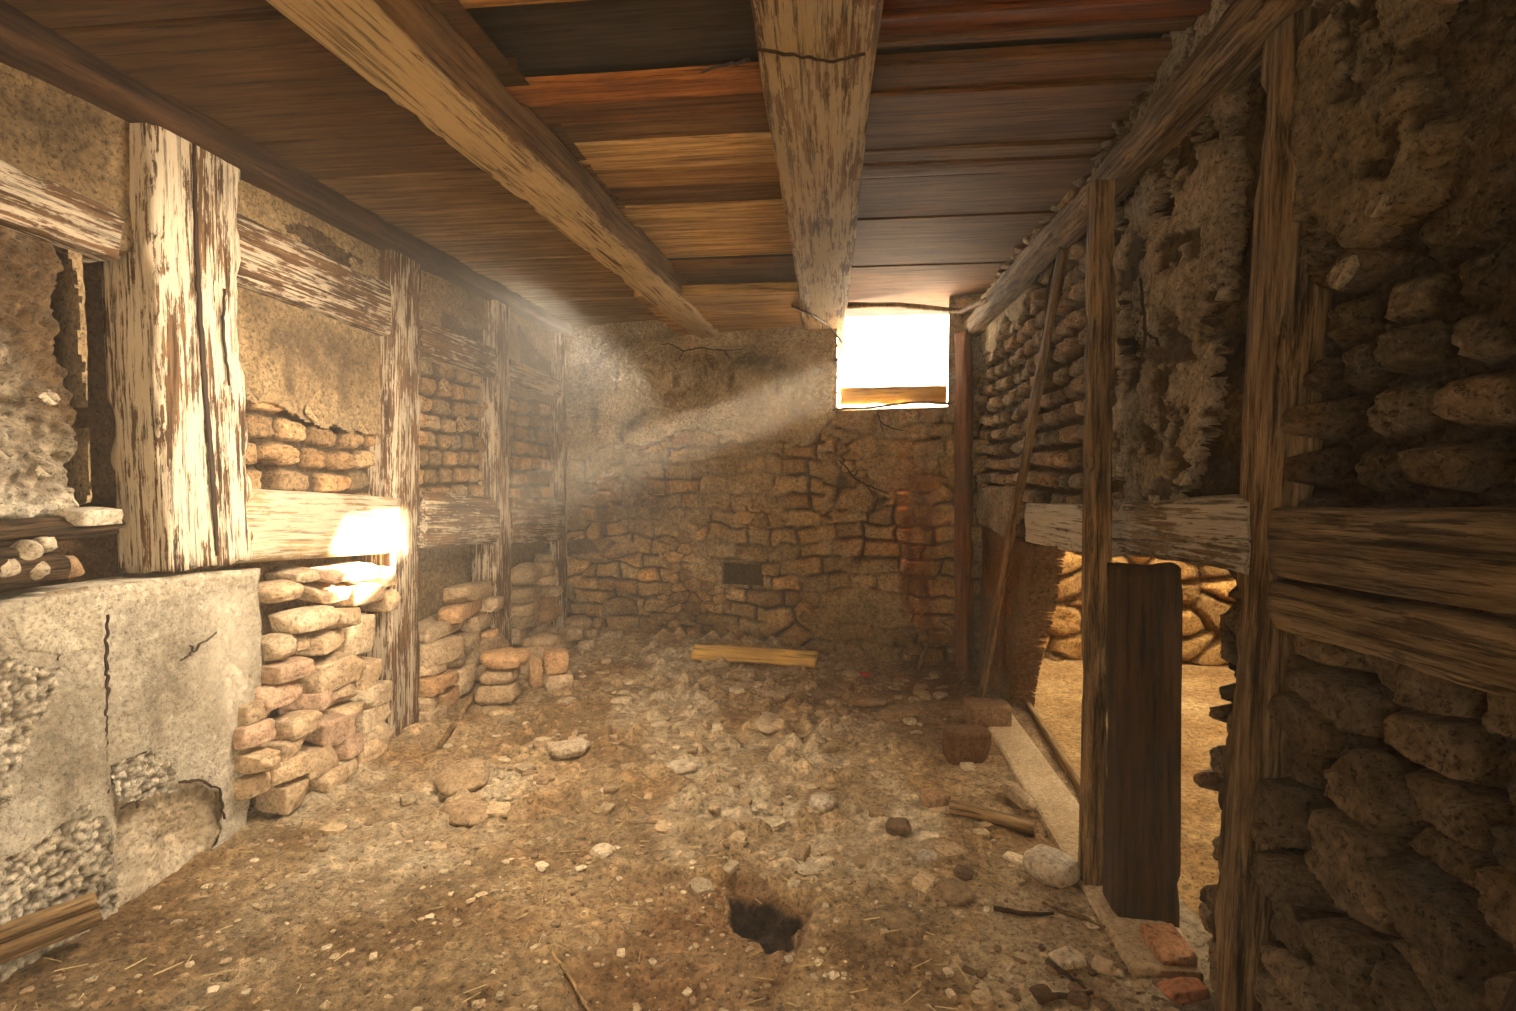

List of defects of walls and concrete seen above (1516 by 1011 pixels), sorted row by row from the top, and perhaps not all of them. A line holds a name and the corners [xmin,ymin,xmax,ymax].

crack [103,614,226,819]